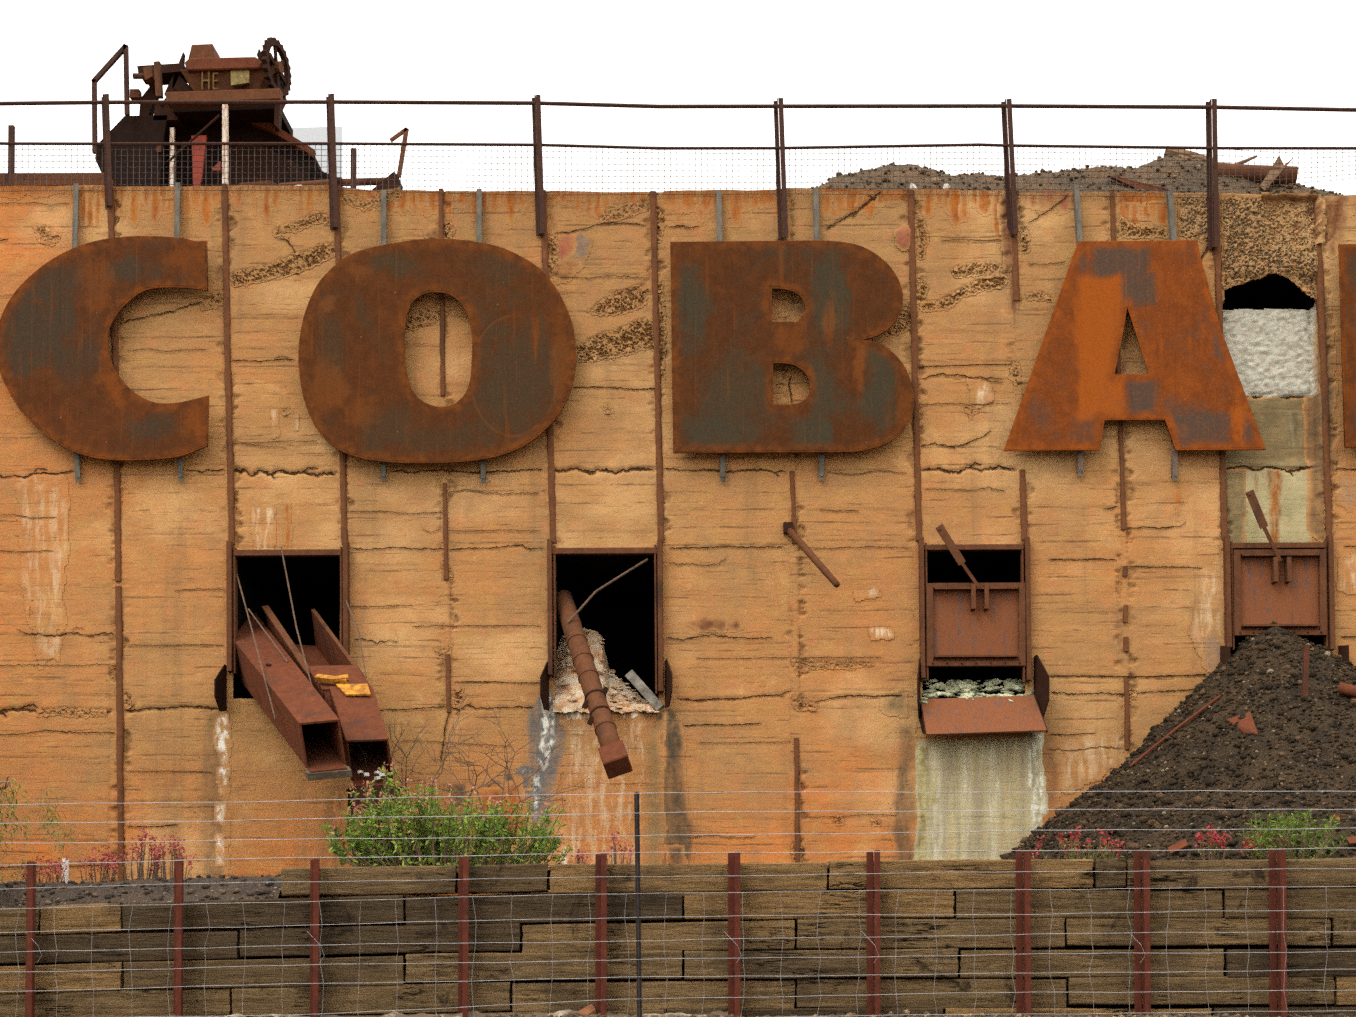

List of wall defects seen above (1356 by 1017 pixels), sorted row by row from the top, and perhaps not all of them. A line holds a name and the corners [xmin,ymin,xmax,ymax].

spalling [1116,194,1318,310]
leakage [1188,295,1356,673]
crack [1227,465,1356,475]
leakage [475,687,699,864]
leakage [887,721,1127,860]